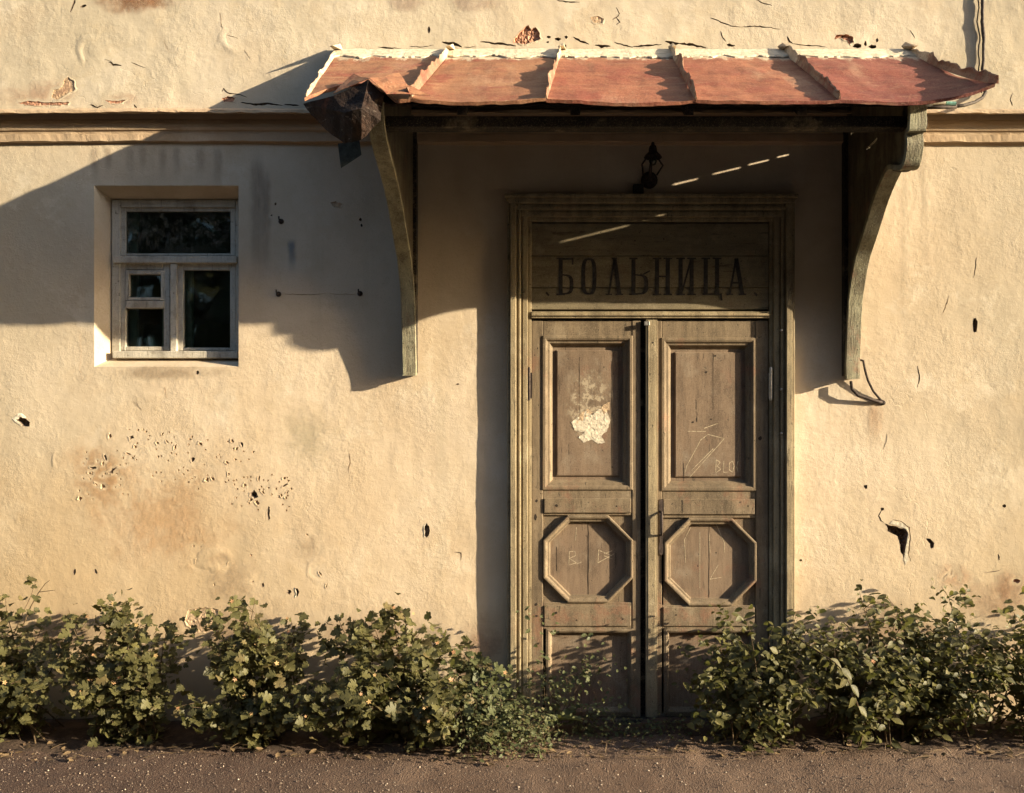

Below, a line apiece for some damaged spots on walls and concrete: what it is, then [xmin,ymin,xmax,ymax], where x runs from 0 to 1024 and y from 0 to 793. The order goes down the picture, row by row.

peeling [513,25,568,47]
crack [574,0,825,48]
peeling [18,77,77,107]
crack [222,88,299,106]
spalling [76,428,293,512]